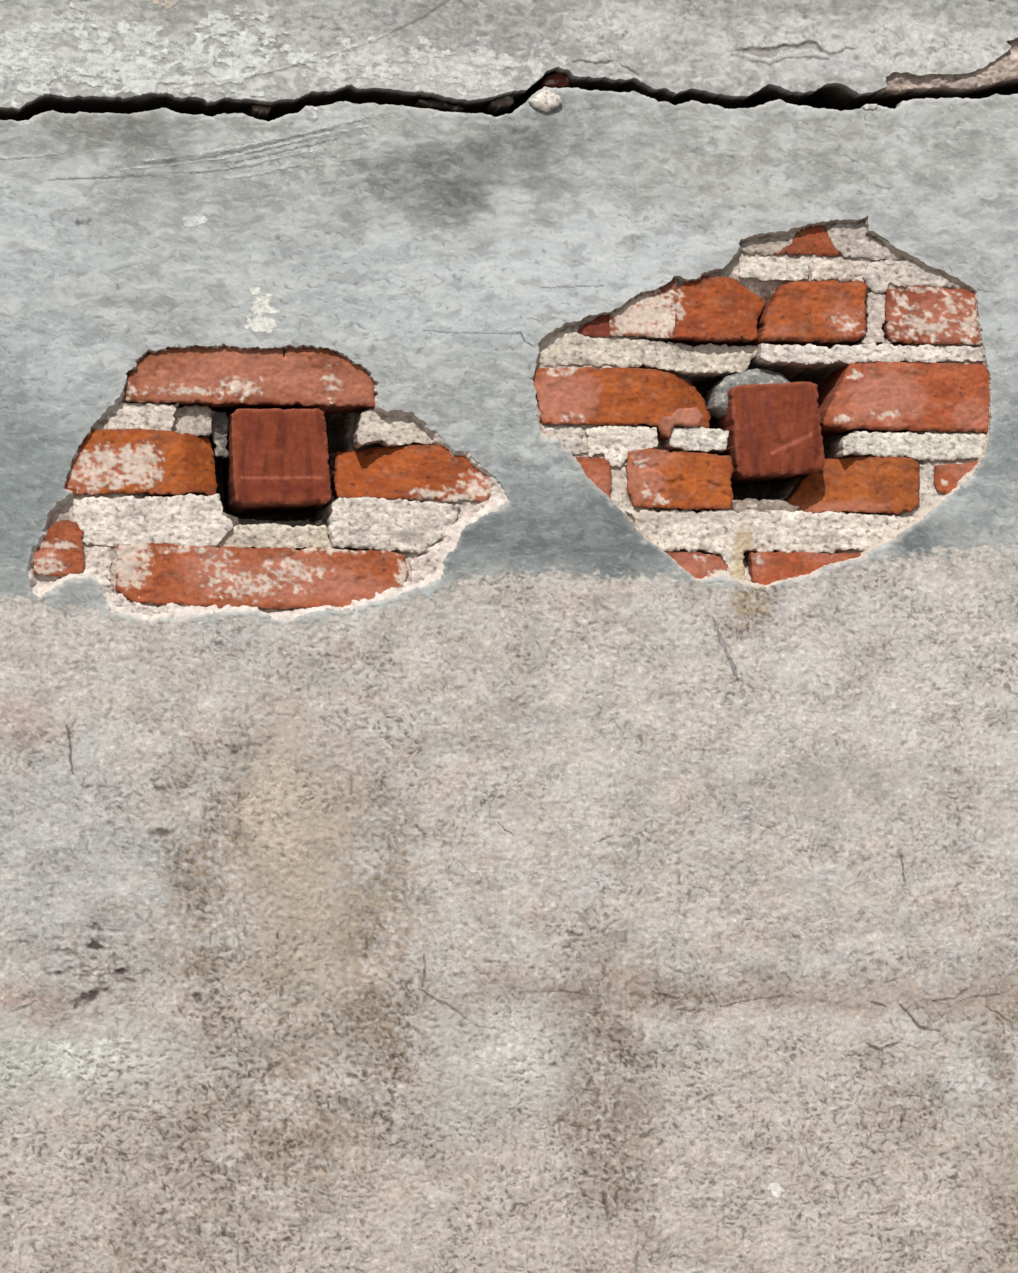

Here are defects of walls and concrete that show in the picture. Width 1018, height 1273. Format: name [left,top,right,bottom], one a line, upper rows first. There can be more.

crack [0,72,925,122]
spalling [865,38,1018,102]
crack [961,84,1018,99]
spalling [530,216,990,590]
spalling [27,286,508,622]